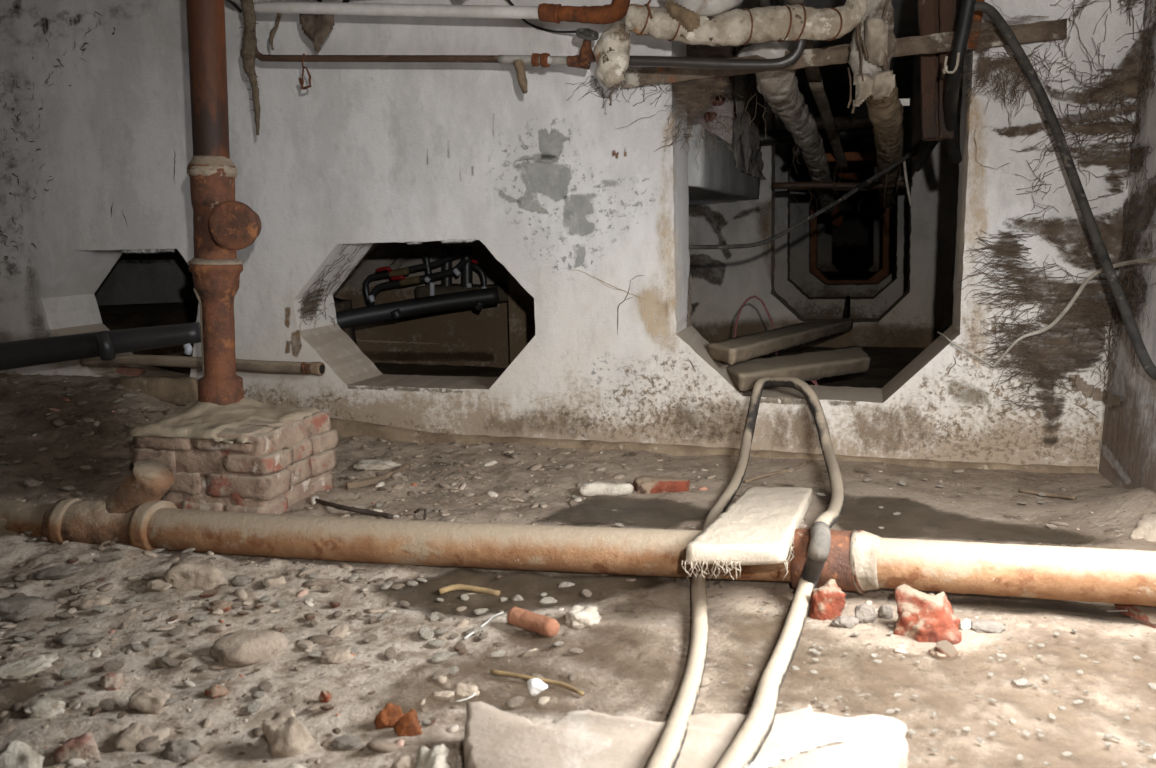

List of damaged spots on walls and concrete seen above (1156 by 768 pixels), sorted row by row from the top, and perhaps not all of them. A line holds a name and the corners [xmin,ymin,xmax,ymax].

peeling [499,120,652,269]
water stain [950,382,988,403]
water stain [673,404,739,439]
water stain [775,408,817,447]
water stain [852,407,927,450]